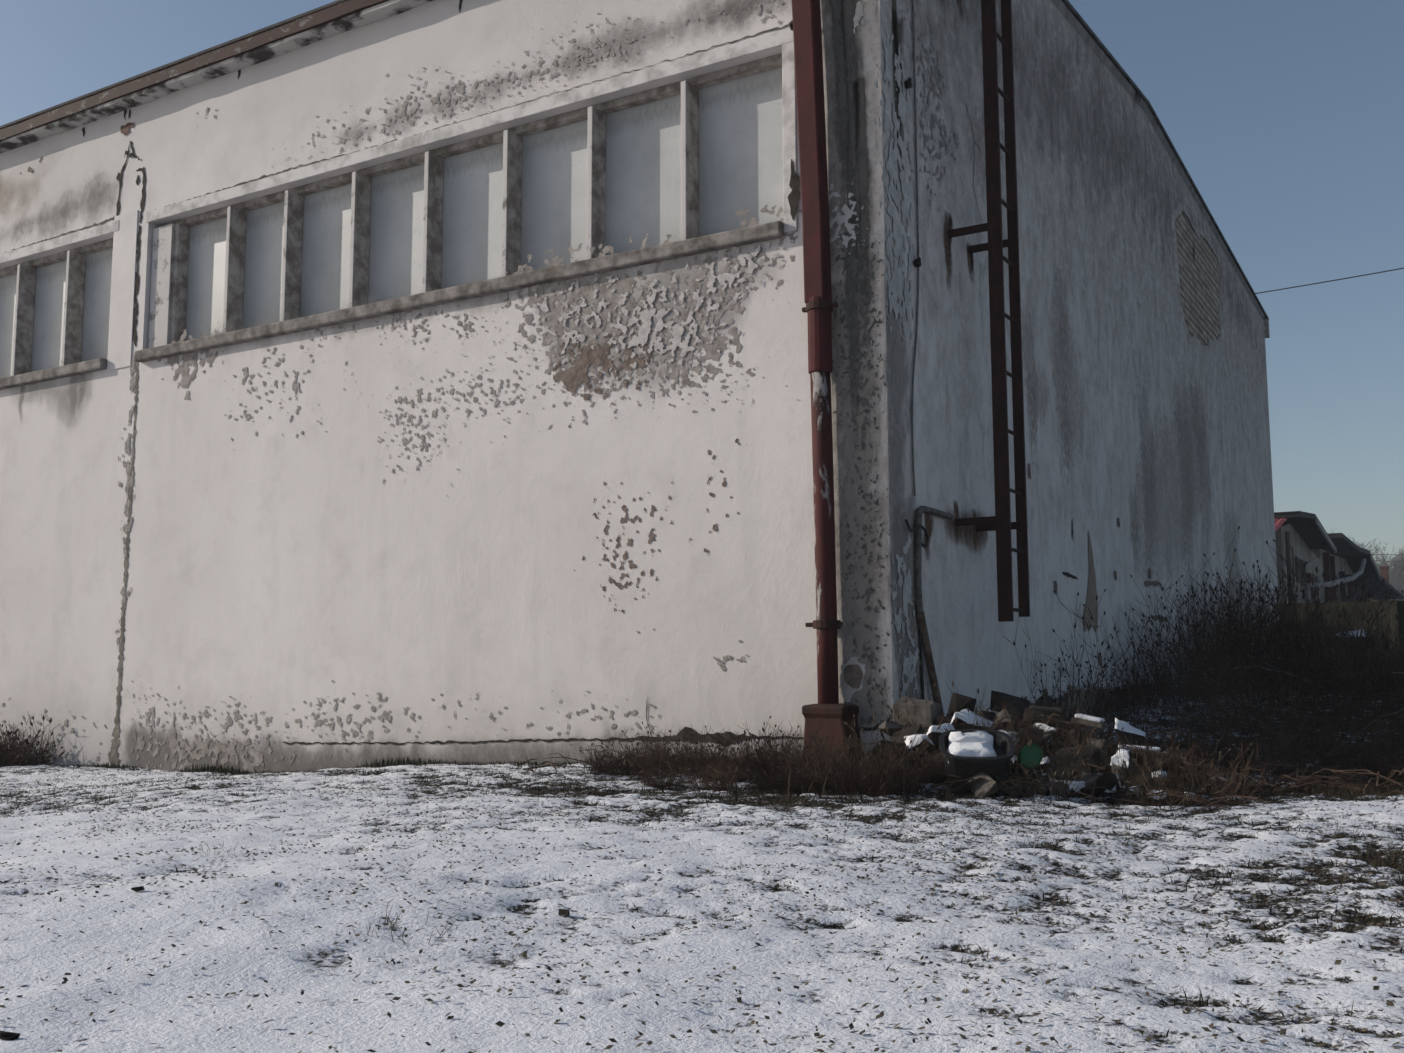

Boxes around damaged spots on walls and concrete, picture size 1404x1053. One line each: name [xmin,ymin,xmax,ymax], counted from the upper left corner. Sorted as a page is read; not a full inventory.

leakage [272,12,643,182]
peeling [115,586,131,650]
peeling [118,353,136,559]
crack [4,24,804,766]
peeling [157,199,802,484]
peeling [574,475,673,614]
peeling [689,450,739,555]
corrosion [895,498,987,699]
flaking render [1084,531,1098,633]
flaking render [1171,201,1221,357]